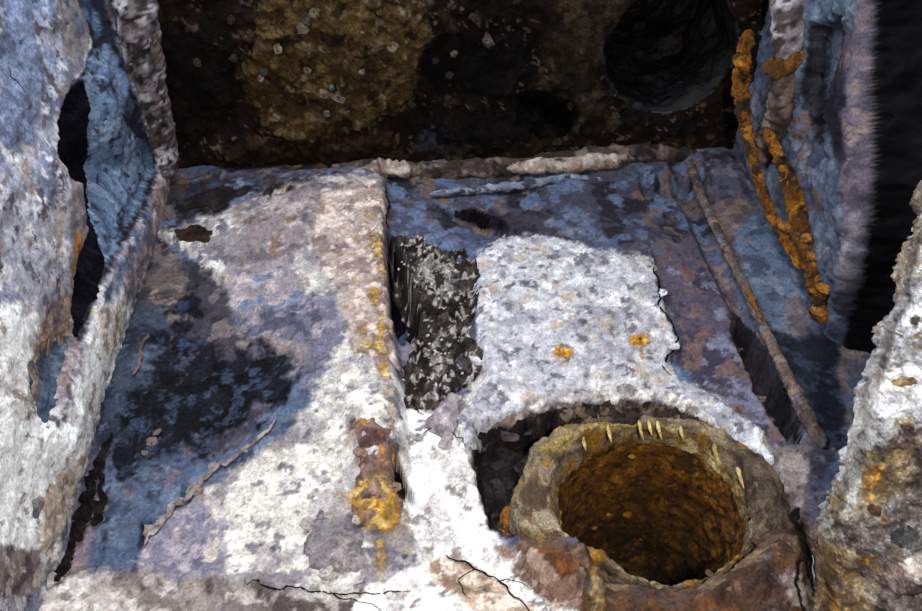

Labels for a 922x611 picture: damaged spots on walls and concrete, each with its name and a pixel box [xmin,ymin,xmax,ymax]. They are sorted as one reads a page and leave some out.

corrosion [731,29,830,324]
leakage [164,277,206,319]
corrosion [358,223,394,383]
corrosion [348,468,400,569]
crack [245,579,411,610]
crack [446,555,530,611]